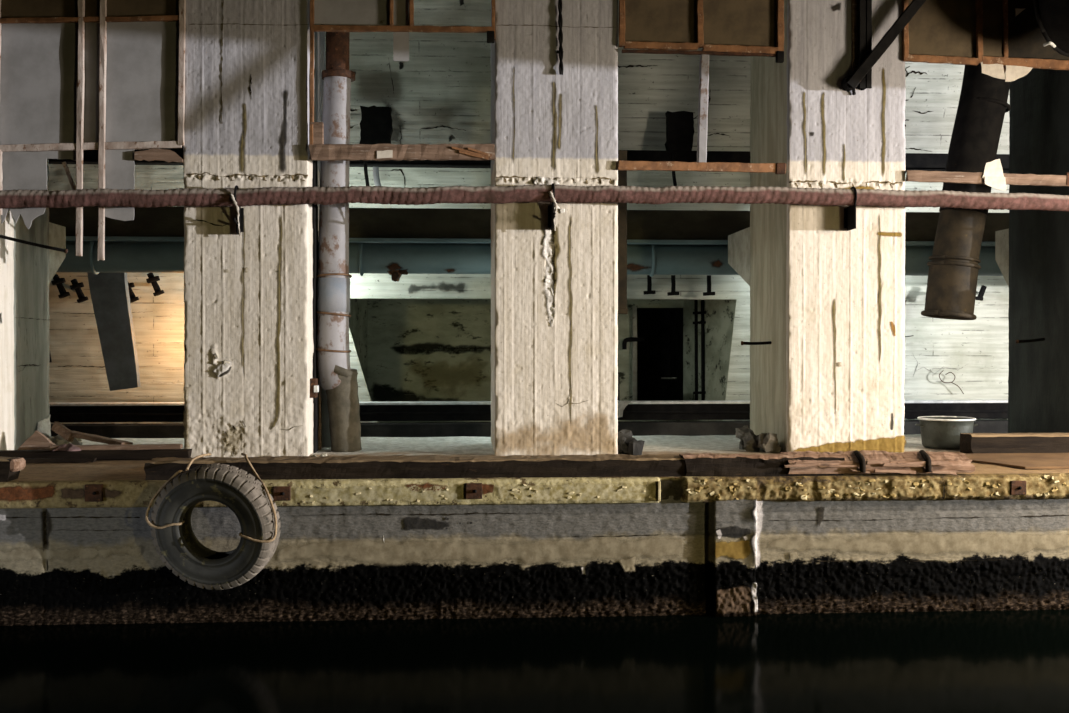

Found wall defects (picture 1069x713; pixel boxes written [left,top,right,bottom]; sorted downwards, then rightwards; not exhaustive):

peeling [213,353,232,377]